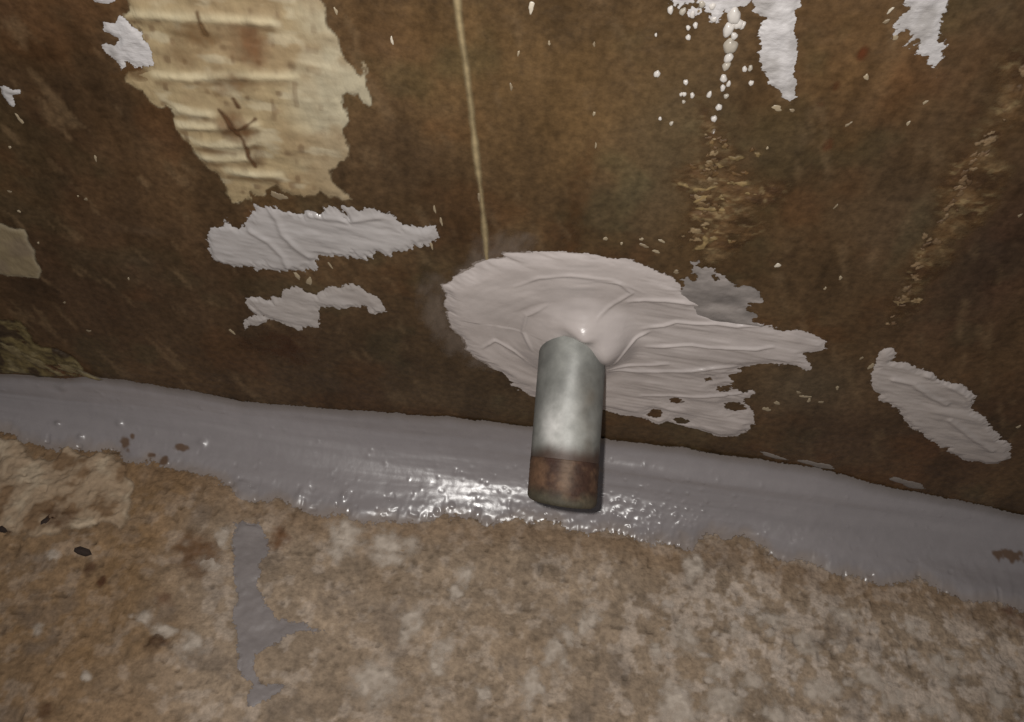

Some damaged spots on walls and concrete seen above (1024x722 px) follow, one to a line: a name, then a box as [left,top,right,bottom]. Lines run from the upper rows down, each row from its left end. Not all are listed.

peeling [124,0,372,203]